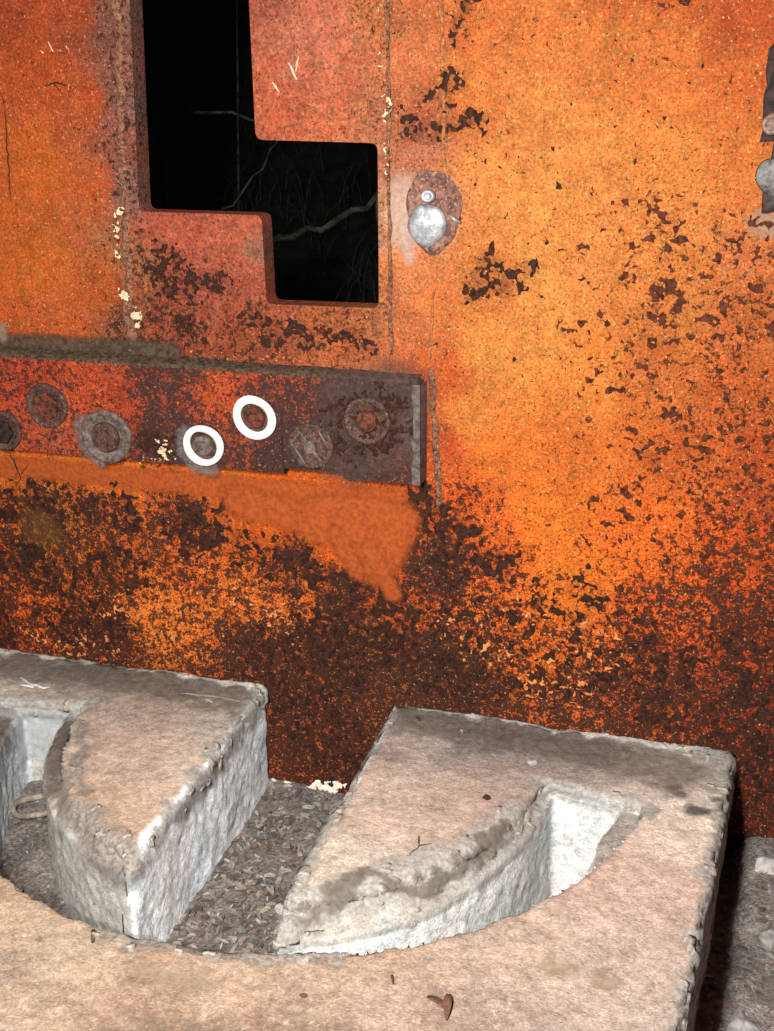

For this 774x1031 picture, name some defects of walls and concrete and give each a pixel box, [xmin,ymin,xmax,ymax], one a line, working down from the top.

rust [224,485,420,601]